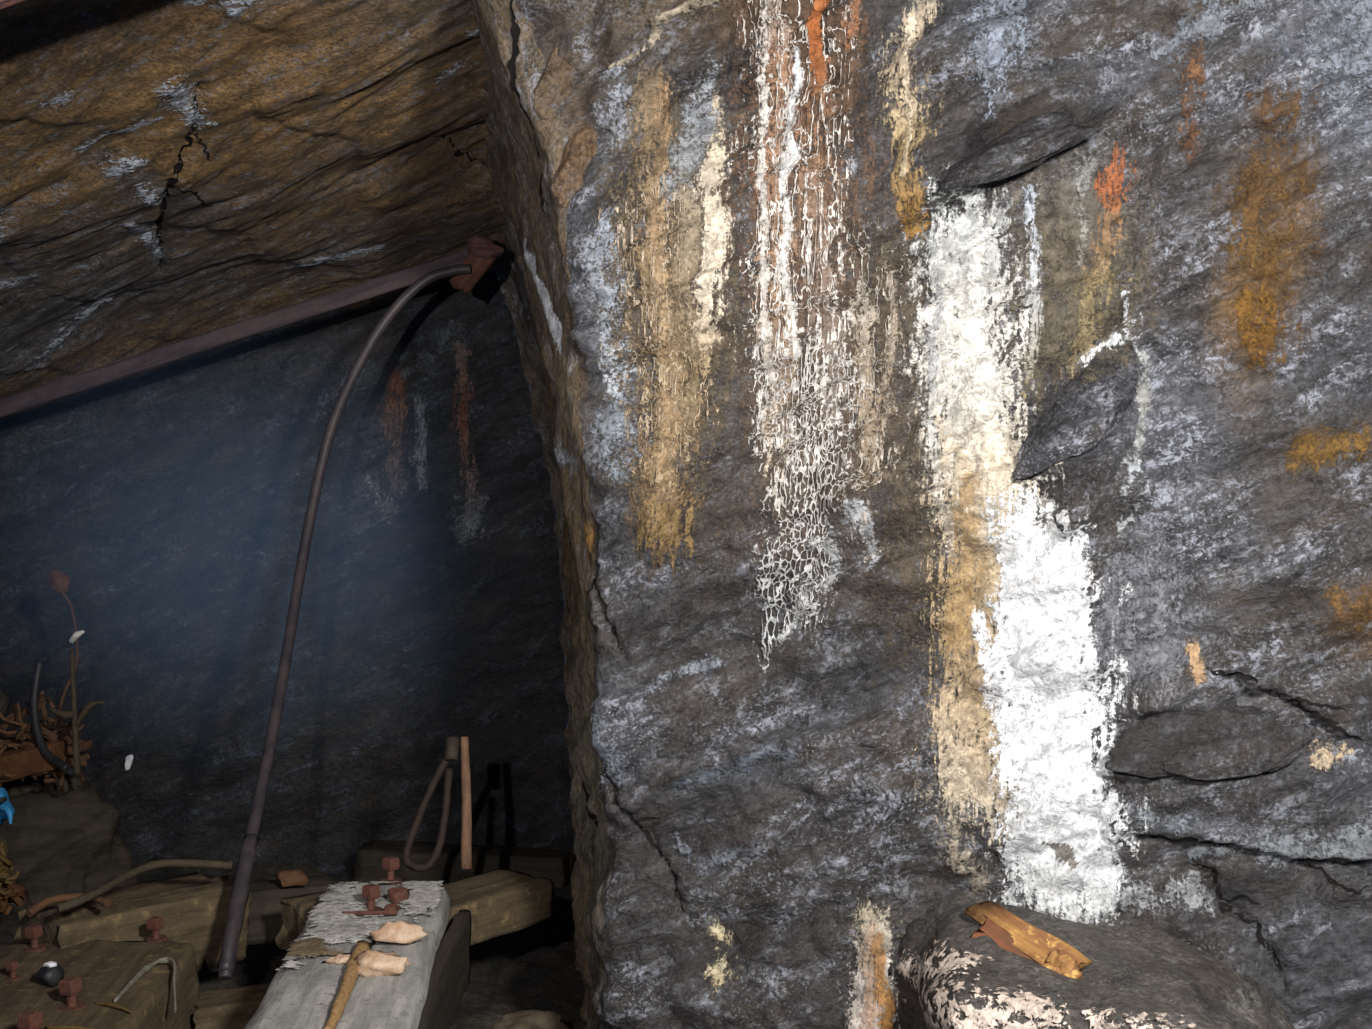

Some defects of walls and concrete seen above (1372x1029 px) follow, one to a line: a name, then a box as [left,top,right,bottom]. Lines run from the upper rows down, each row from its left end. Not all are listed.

crack [155,83,213,271]
crack [507,0,544,212]
corrosion [805,0,866,97]
corrosion [991,108,1159,430]
corrosion [1175,38,1206,166]
corrosion [1209,68,1325,376]
damp [524,0,1372,926]
crack [1205,667,1372,747]
crack [1109,825,1372,991]